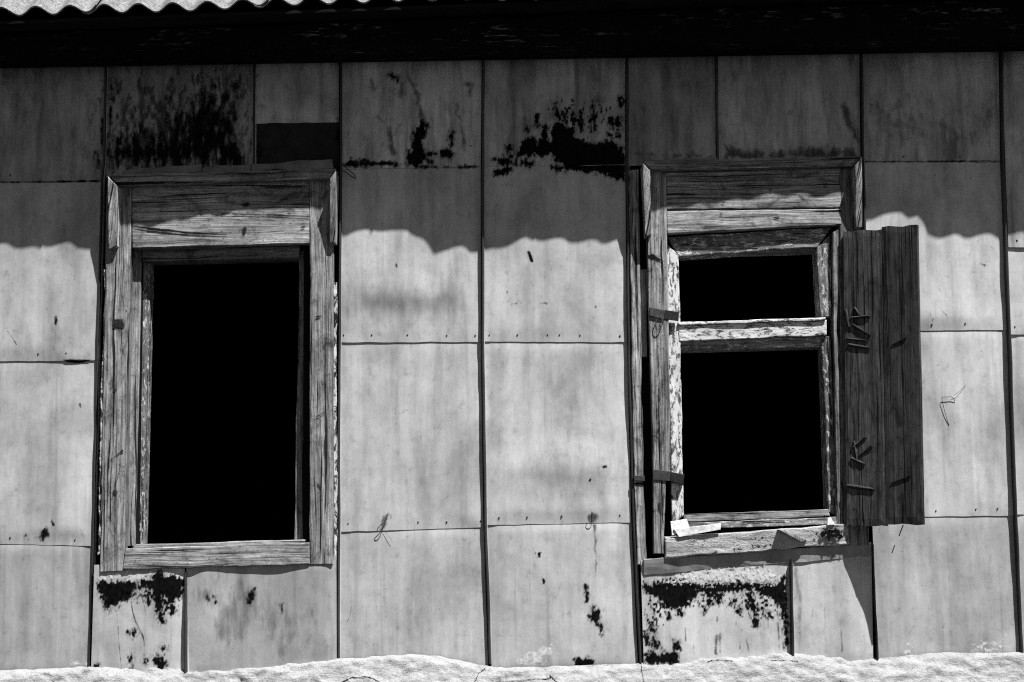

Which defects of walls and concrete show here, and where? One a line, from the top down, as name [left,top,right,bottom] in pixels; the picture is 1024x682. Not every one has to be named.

water stain [99,568,184,582]
water stain [663,567,780,587]